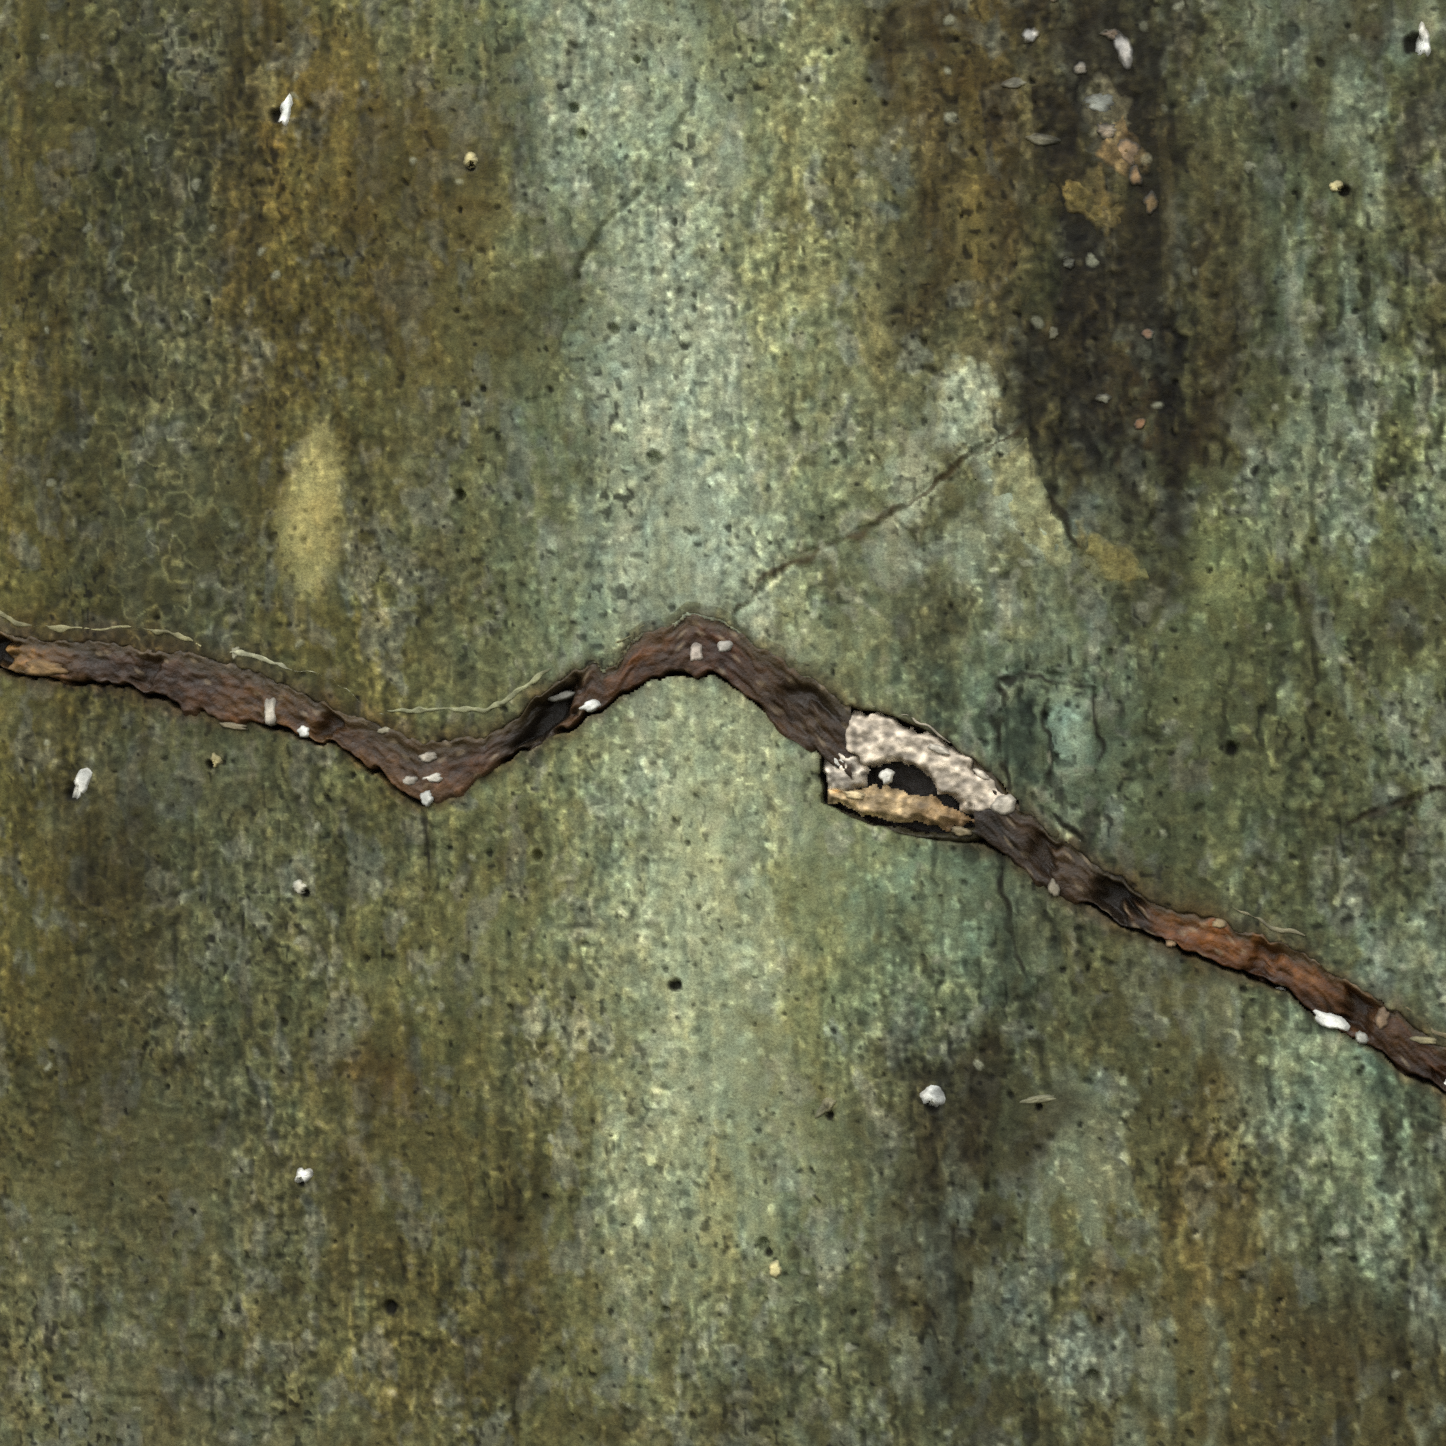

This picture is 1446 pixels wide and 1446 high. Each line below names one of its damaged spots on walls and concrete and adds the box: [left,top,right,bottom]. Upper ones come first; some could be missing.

damp [942,0,1292,728]
crack [0,420,1446,1092]
spalling [821,709,1019,843]
damp [990,624,1097,844]